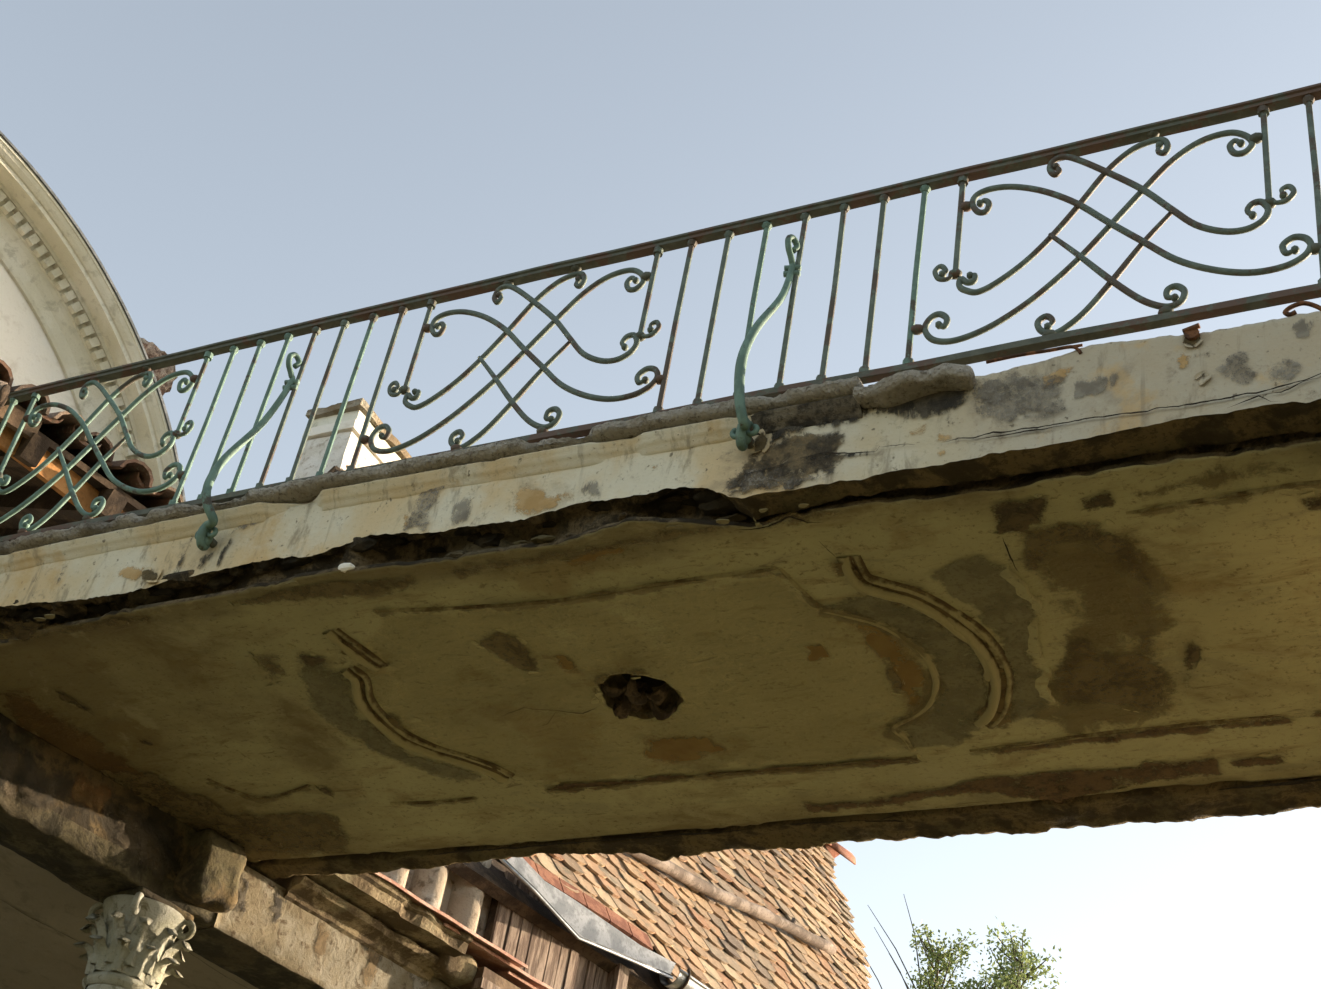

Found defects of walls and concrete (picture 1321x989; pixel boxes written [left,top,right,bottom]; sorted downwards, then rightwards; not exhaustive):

damp [1043,368,1117,398]
damp [931,523,1175,734]
spalling [591,668,682,718]
damp [0,724,59,811]
peeling [548,775,685,793]
peeling [804,753,1283,813]
damp [233,875,249,918]